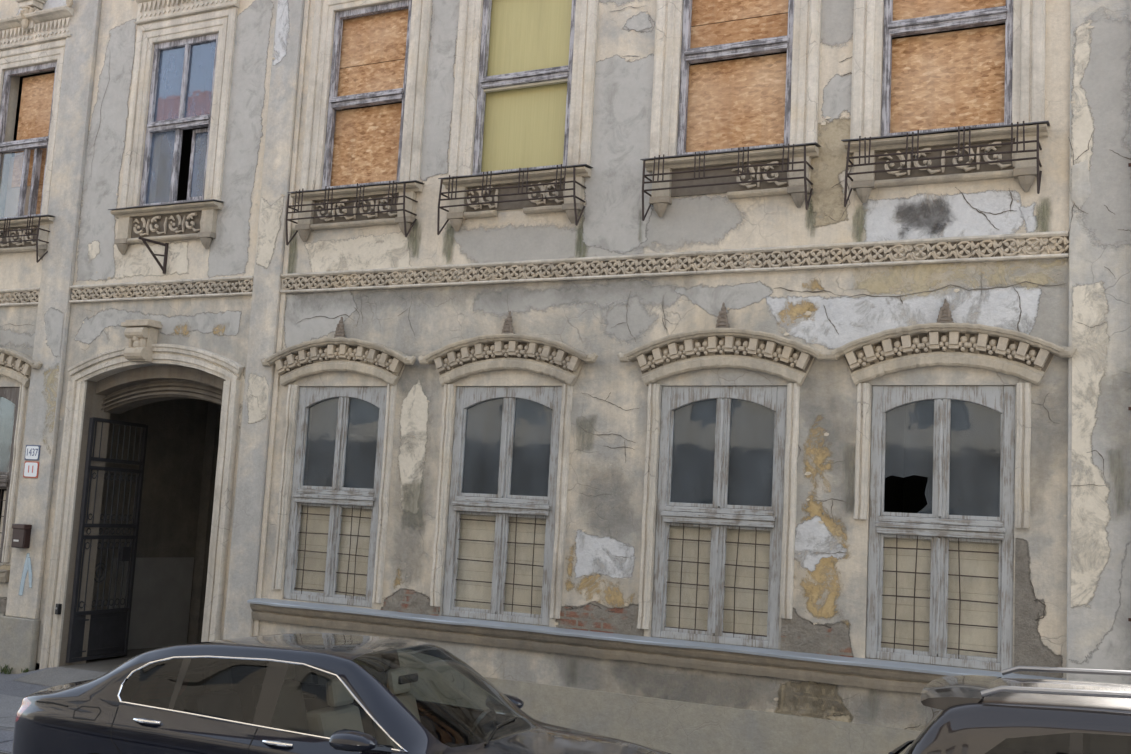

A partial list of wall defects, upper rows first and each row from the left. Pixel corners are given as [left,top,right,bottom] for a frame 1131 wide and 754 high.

peeling [208,0,290,278]
crack [955,187,1014,230]
peeling [1071,7,1131,247]
peeling [473,260,1065,349]
peeling [397,380,430,514]
peeling [1064,281,1111,608]
flaking render [381,569,440,616]
flaking render [555,530,644,636]
flaking render [780,415,853,657]
flaking render [1014,538,1131,685]